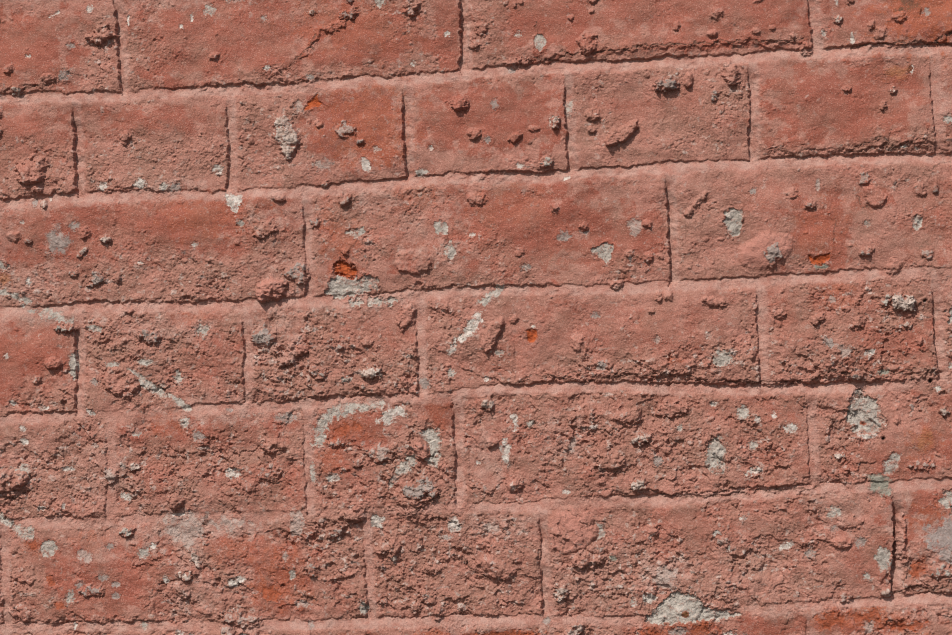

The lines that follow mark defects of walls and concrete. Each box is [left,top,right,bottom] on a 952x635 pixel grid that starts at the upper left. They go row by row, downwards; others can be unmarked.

spalling [324,257,404,308]
spalling [845,388,888,434]
spalling [628,589,748,635]